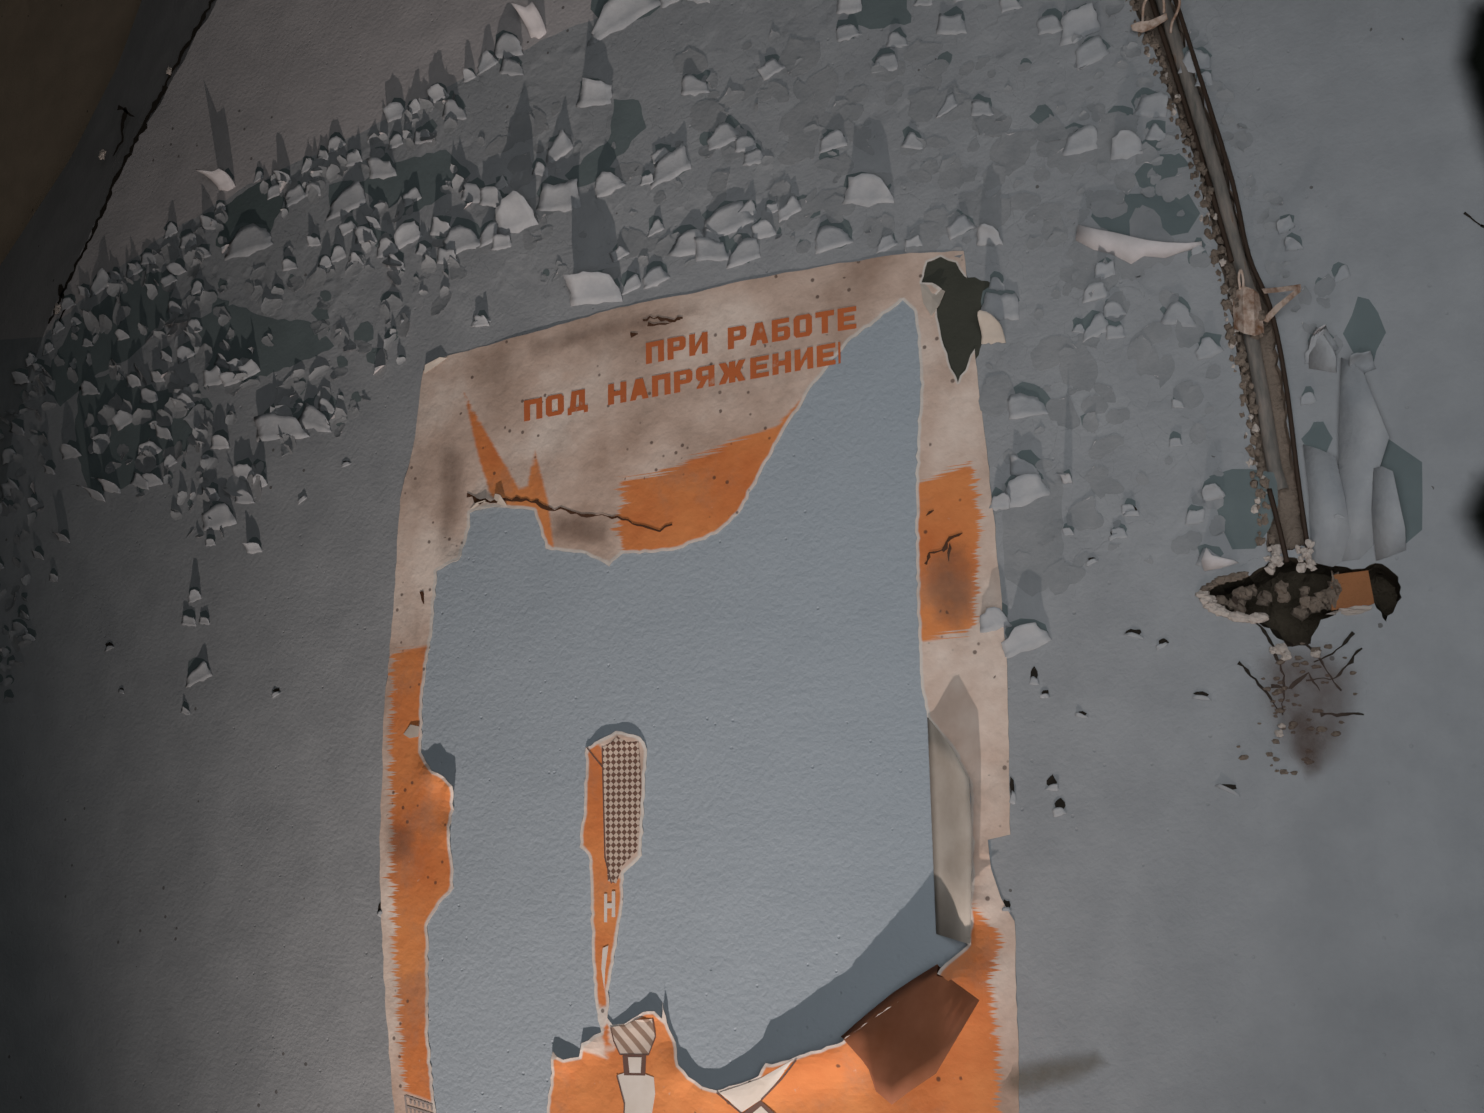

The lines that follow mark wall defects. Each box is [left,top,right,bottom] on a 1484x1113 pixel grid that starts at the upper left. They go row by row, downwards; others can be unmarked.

peeling [0,0,1253,703]
peeling [1171,262,1423,775]
peeling [181,658,212,715]
peeling [1046,774,1067,817]
peeling [1215,784,1240,797]